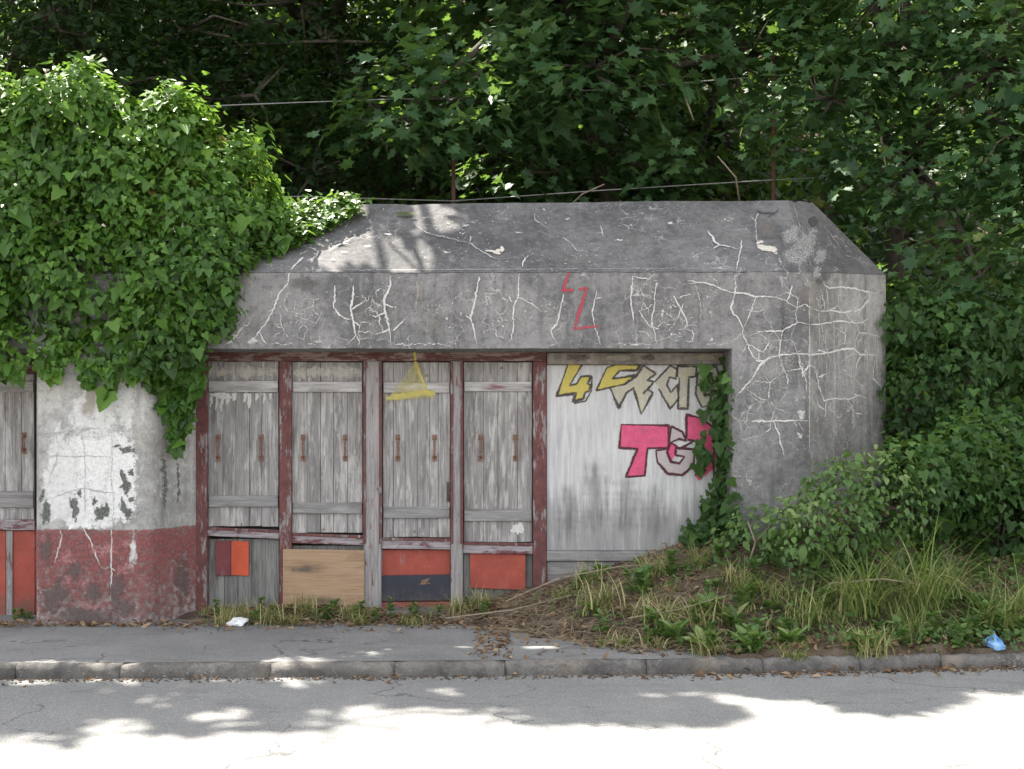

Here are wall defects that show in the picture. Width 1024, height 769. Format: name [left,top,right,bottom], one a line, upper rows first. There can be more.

crack [208,237,406,345]
crack [416,225,564,345]
crack [592,291,602,345]
crack [630,208,881,455]
peeling [39,373,139,530]
peeling [210,392,272,411]
crack [41,428,139,601]